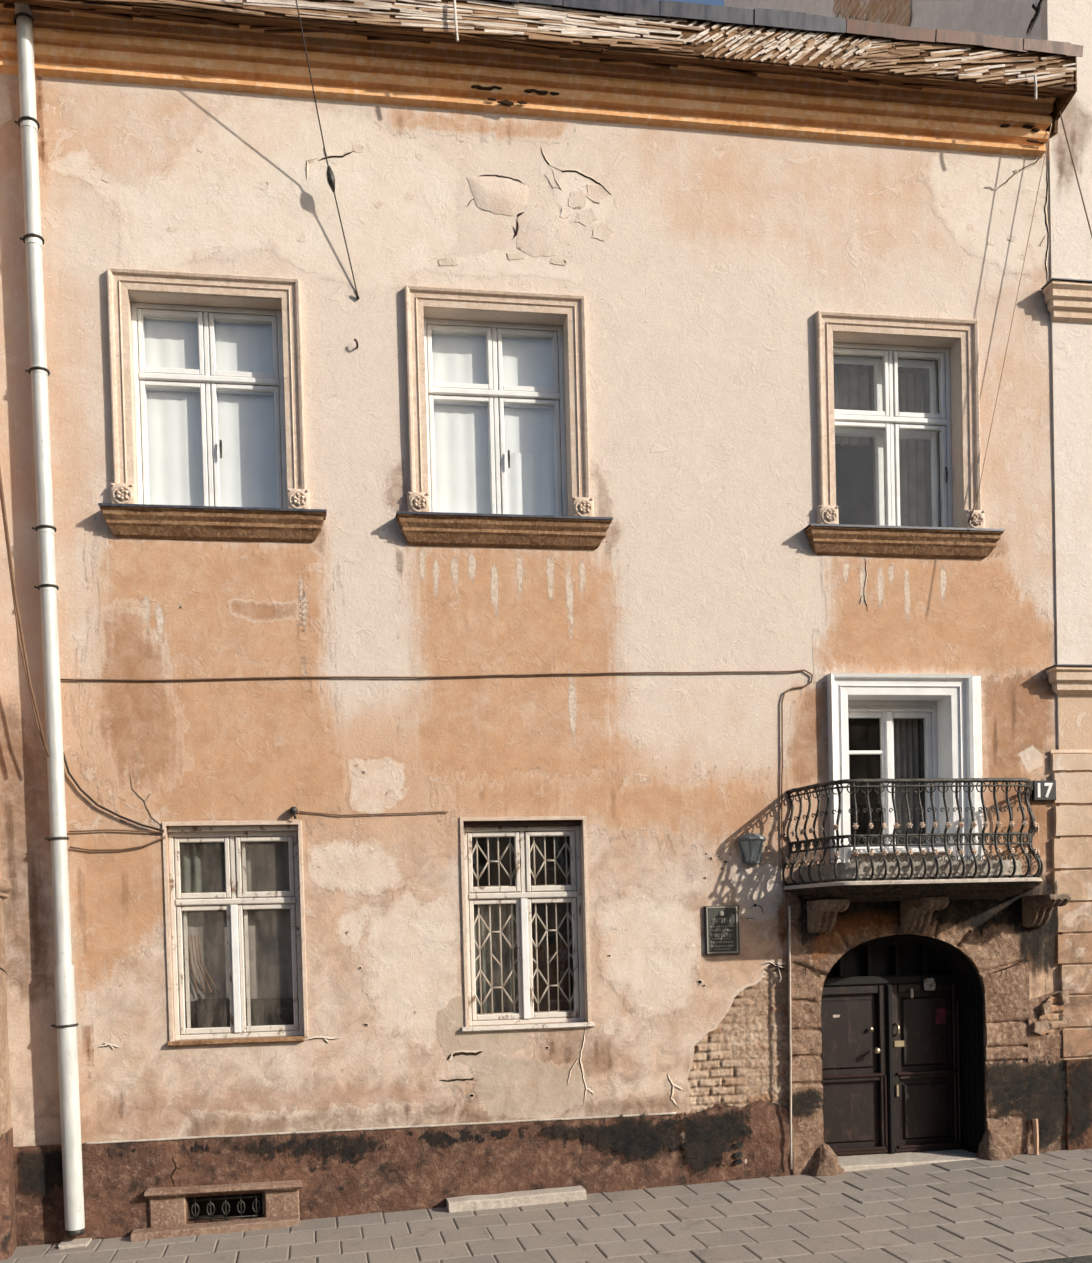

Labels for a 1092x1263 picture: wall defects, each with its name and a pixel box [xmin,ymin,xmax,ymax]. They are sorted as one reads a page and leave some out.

peeling [44,92,589,299]
crack [306,148,354,181]
flaking render [539,158,617,241]
crack [984,156,1050,282]
leakage [0,688,56,1013]
leakage [64,504,357,1010]
peeling [346,755,407,818]
leakage [381,451,1059,990]
peeling [307,833,463,1057]
leakage [79,1021,693,1181]
crack [568,1031,593,1103]
flaking render [685,960,789,1113]